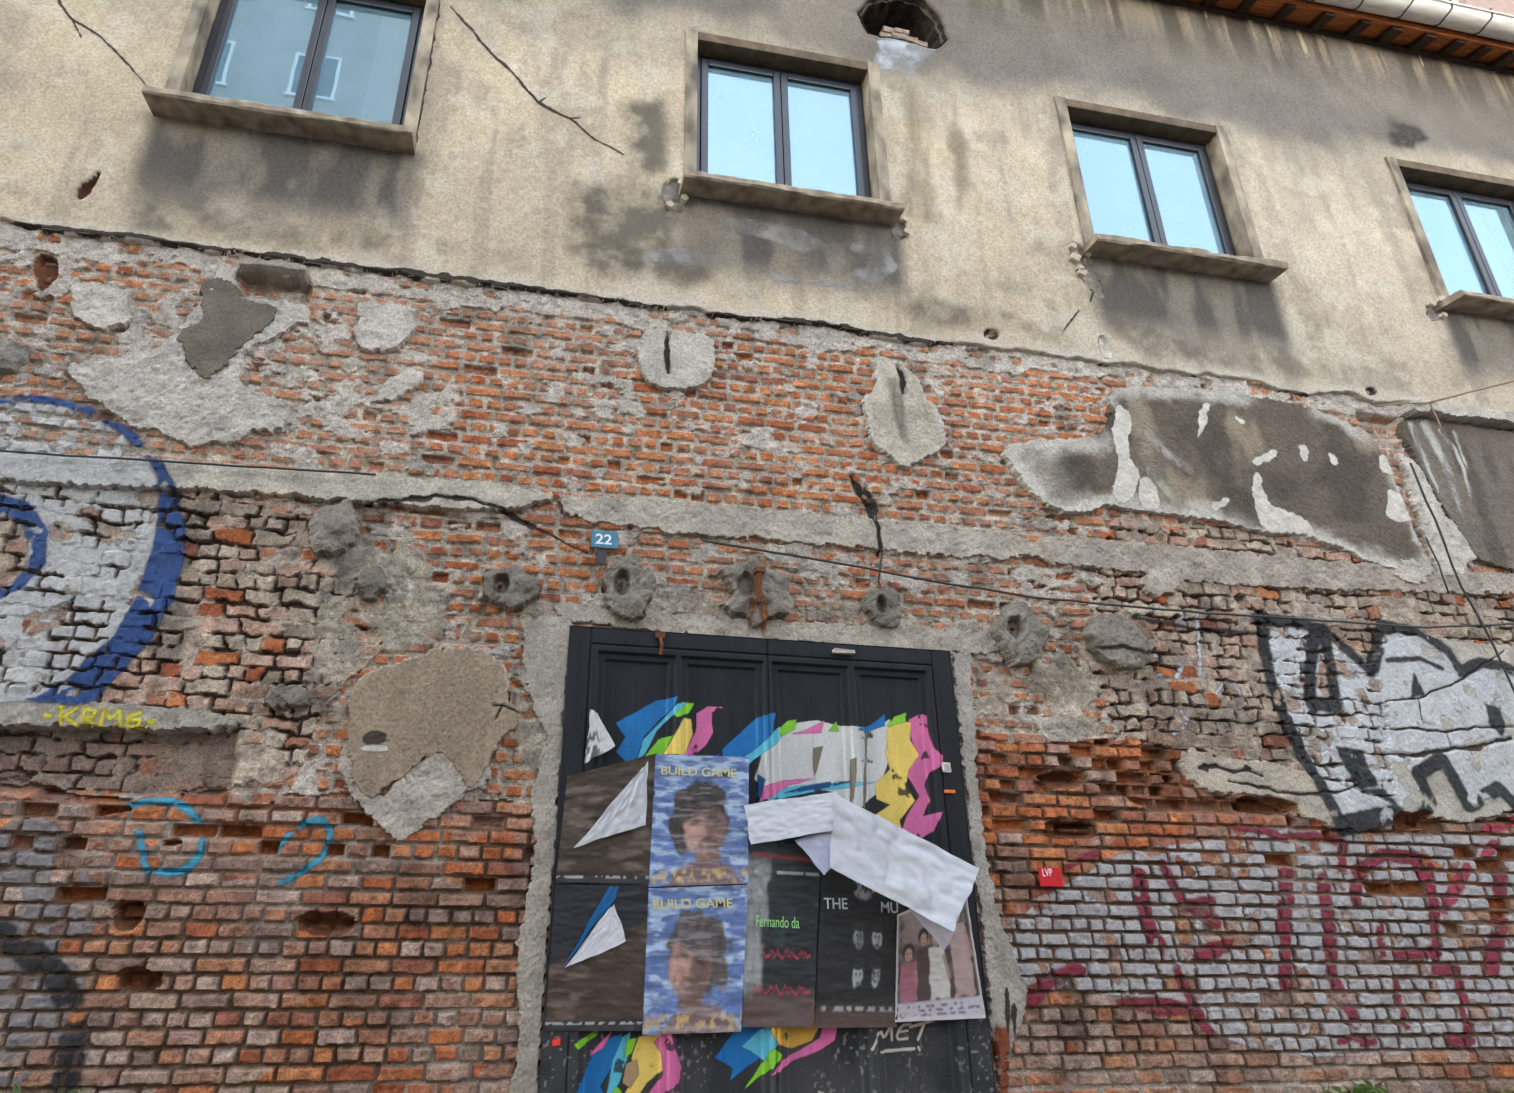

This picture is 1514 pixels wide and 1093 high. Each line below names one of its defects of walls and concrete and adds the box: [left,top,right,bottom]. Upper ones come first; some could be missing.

crack [58,0,146,85]
crack [416,4,624,155]
hole [857,0,947,49]
damp [877,40,935,70]
crack [365,493,588,554]
crack [850,477,883,558]
peeling [1111,405,1160,510]
peeling [1197,402,1210,438]
peeling [1252,449,1317,543]
peeling [1379,454,1412,522]
crack [1375,651,1512,758]
crack [1198,763,1359,796]